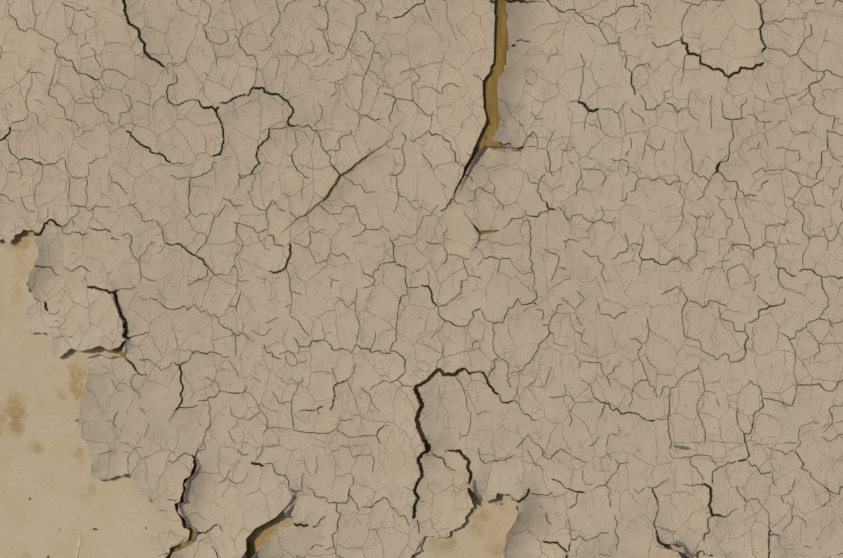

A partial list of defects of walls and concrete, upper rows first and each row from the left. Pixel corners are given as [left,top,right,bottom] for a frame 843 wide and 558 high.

crack [8,0,183,164]
peeling [0,171,338,558]
crack [0,86,389,508]
crack [123,0,699,558]
peeling [380,452,812,558]
crack [544,0,843,558]